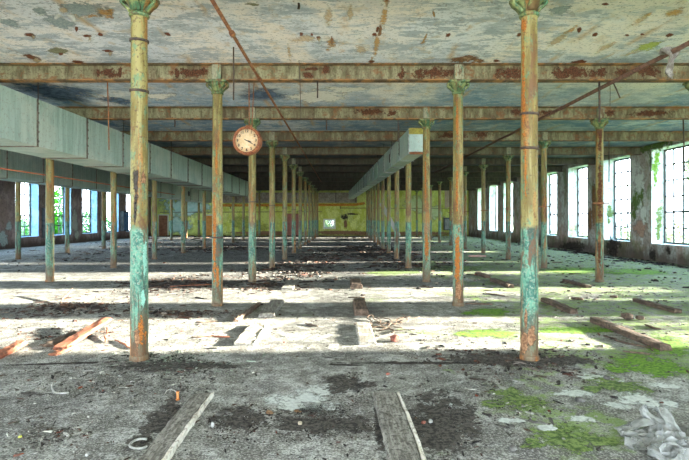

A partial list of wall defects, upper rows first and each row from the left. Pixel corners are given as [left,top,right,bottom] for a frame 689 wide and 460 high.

peeling [32,1,111,31]
peeling [451,55,485,65]
rust [96,67,122,78]
rust [170,67,210,79]
rust [397,66,454,79]
rust [551,59,661,79]
leakage [15,83,131,105]
leakage [242,88,282,100]
rust [354,108,398,116]
rust [627,109,670,117]
peeling [631,158,648,238]
rust [212,135,220,294]